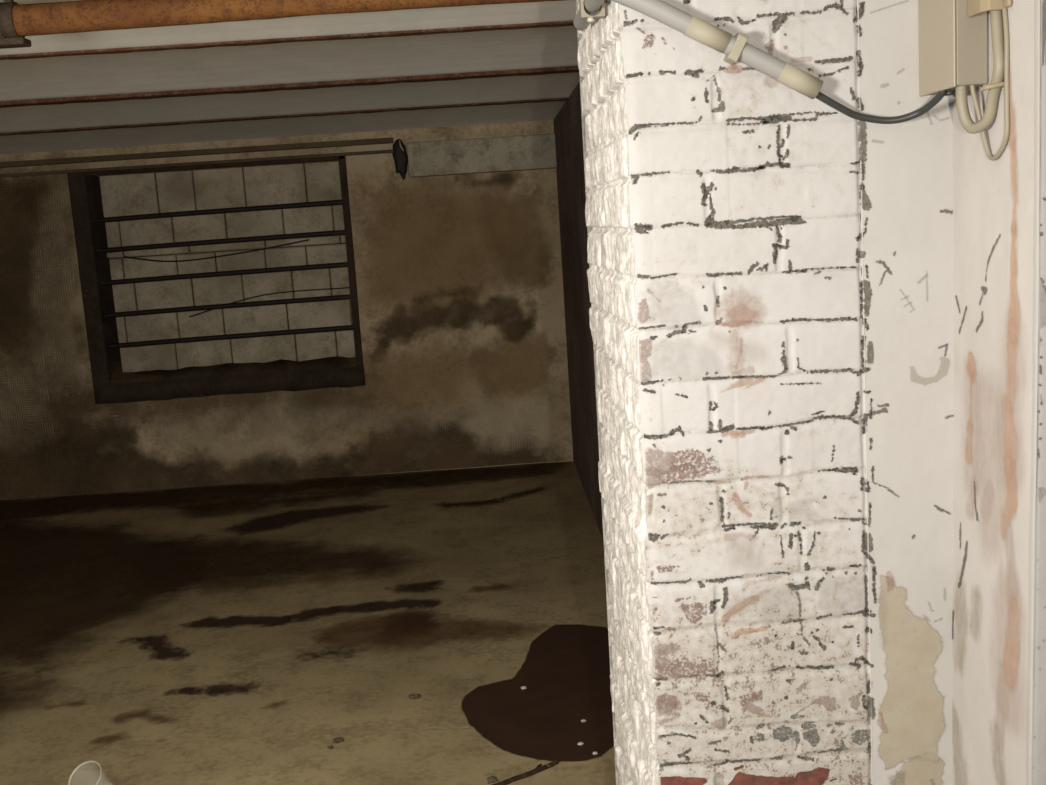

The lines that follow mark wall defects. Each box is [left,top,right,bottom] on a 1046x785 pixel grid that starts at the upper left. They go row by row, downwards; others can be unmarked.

damp [374,289,533,354]
corrosion [1001,220,1018,537]
damp [0,418,561,664]
damp [167,683,256,696]
damp [462,624,614,761]
flaking render [728,576,945,785]
peeling [660,776,707,785]